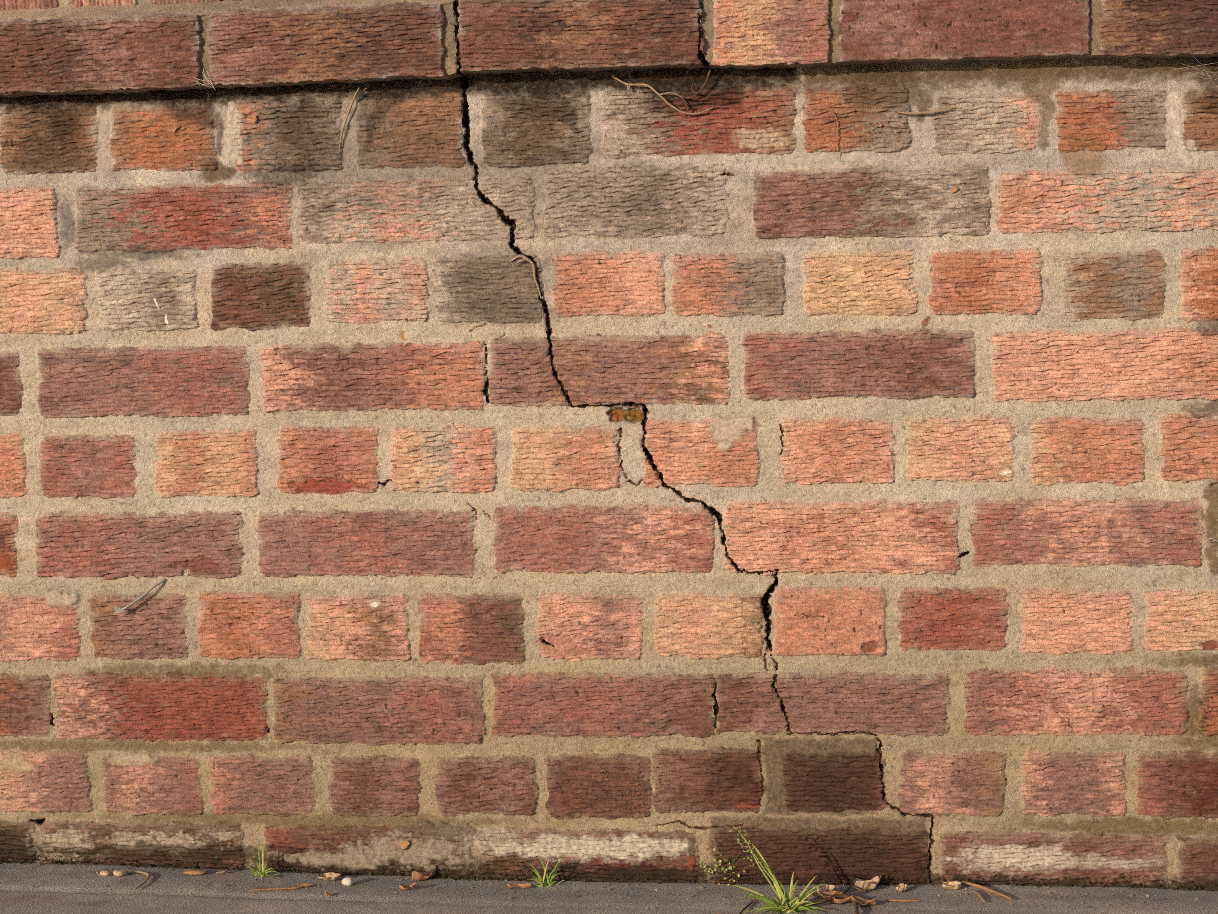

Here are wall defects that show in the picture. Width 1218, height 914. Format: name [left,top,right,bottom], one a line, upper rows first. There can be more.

leakage [0,821,703,881]
crack [453,0,935,884]